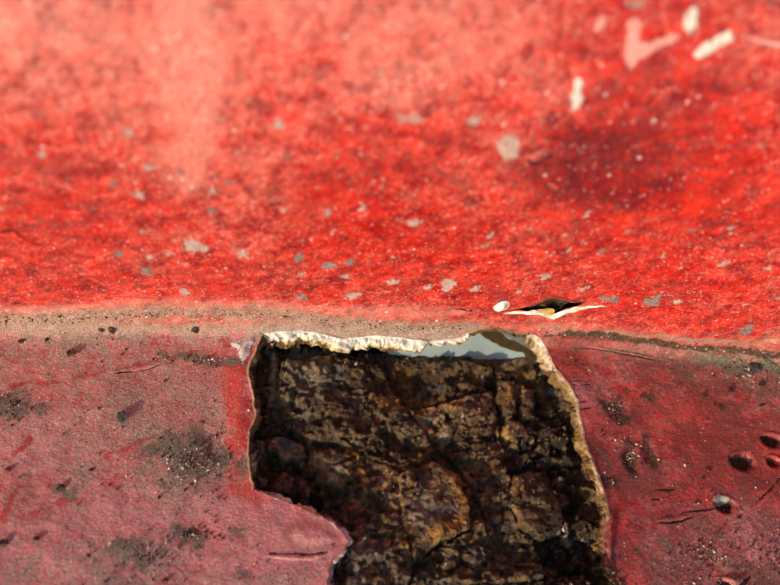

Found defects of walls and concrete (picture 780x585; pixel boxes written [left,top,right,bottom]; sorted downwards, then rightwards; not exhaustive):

spalling [230,328,610,585]